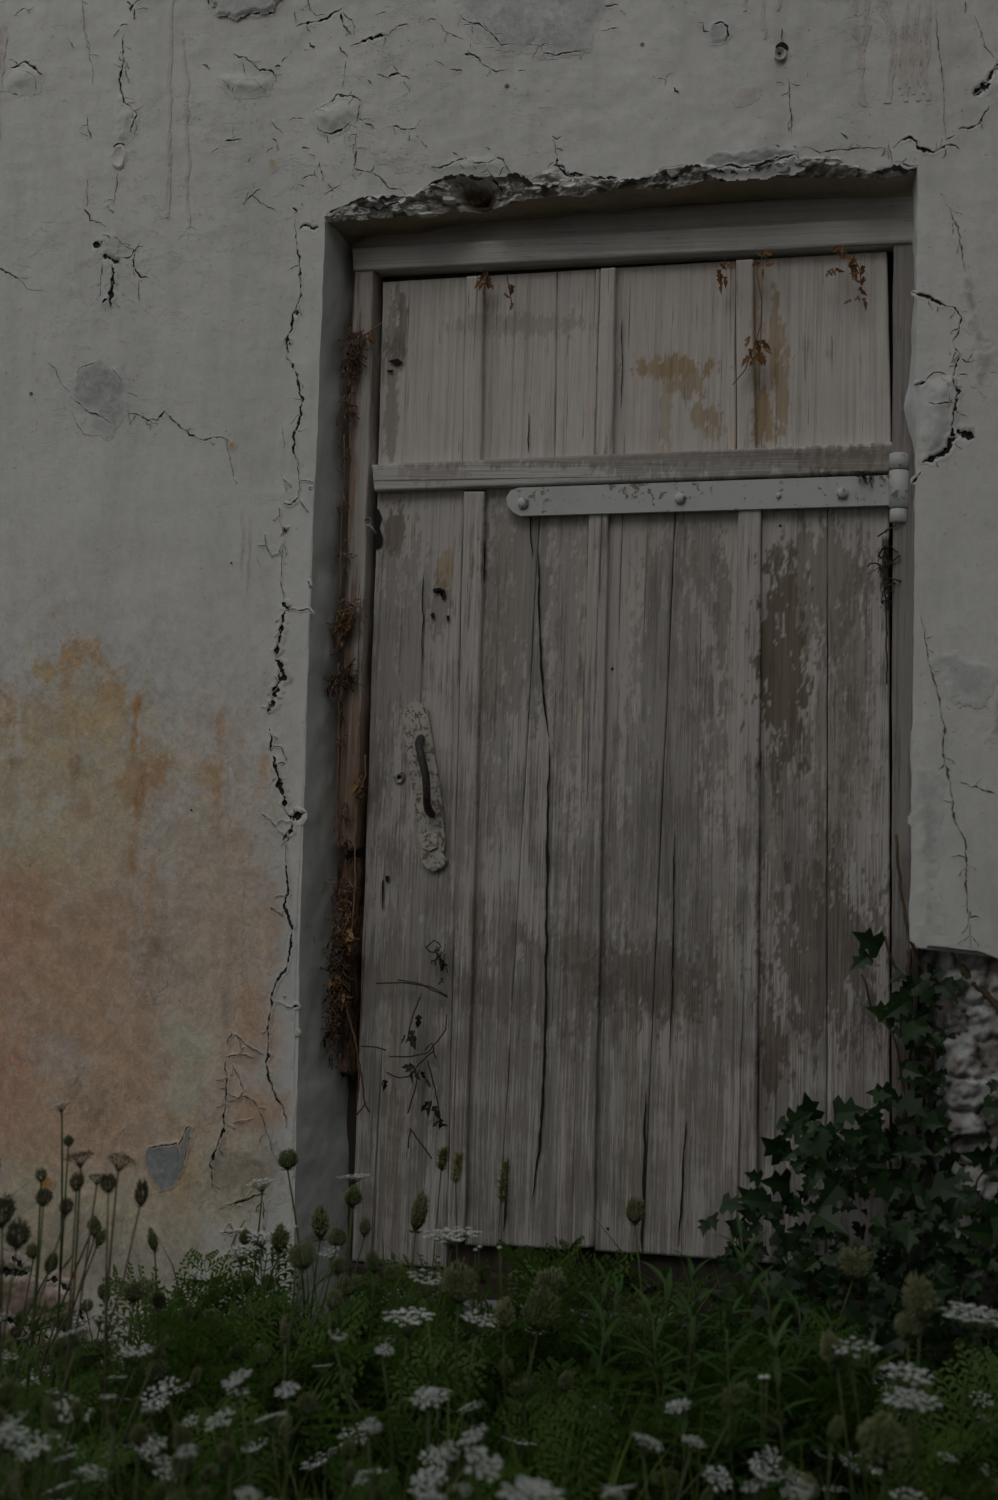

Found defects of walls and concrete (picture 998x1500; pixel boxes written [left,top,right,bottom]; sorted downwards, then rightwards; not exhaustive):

crack [0,267,43,292]
crack [9,58,43,97]
peeling [67,354,130,440]
crack [67,0,150,308]
flaking render [324,143,919,223]
crack [658,71,680,94]
crack [910,205,975,485]
crack [202,0,625,1239]
crack [919,608,995,947]
water stain [0,477,315,1401]
flaking render [911,943,998,1392]